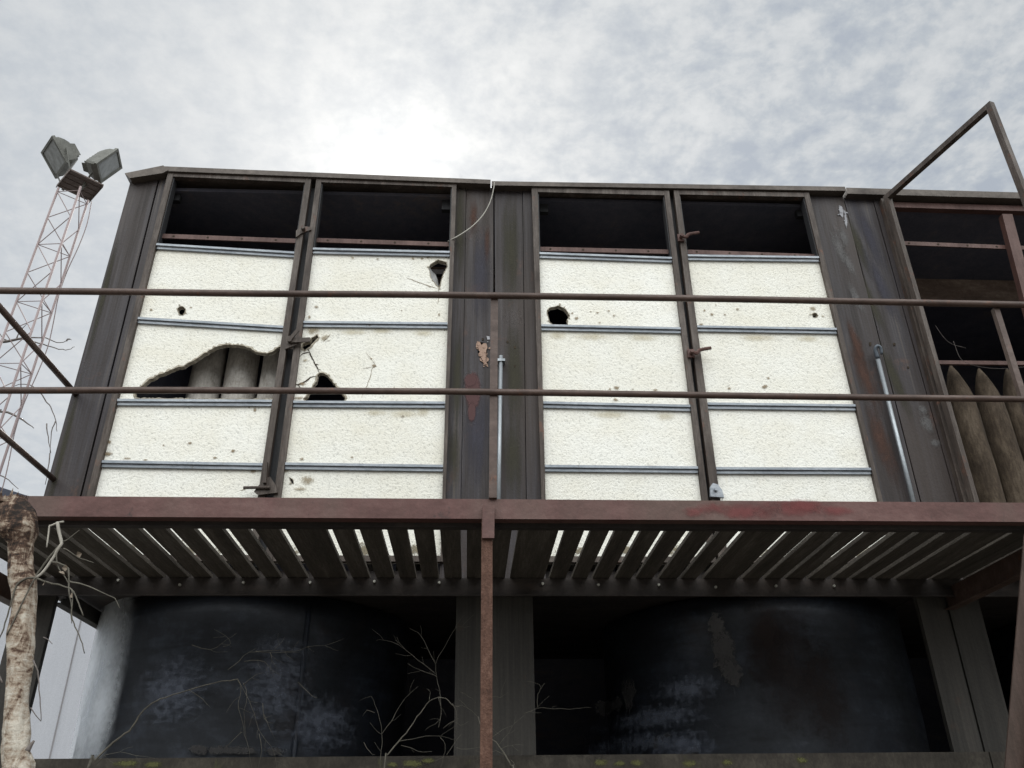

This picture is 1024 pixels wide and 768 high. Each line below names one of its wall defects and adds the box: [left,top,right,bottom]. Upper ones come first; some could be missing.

peeling [476,336,490,367]